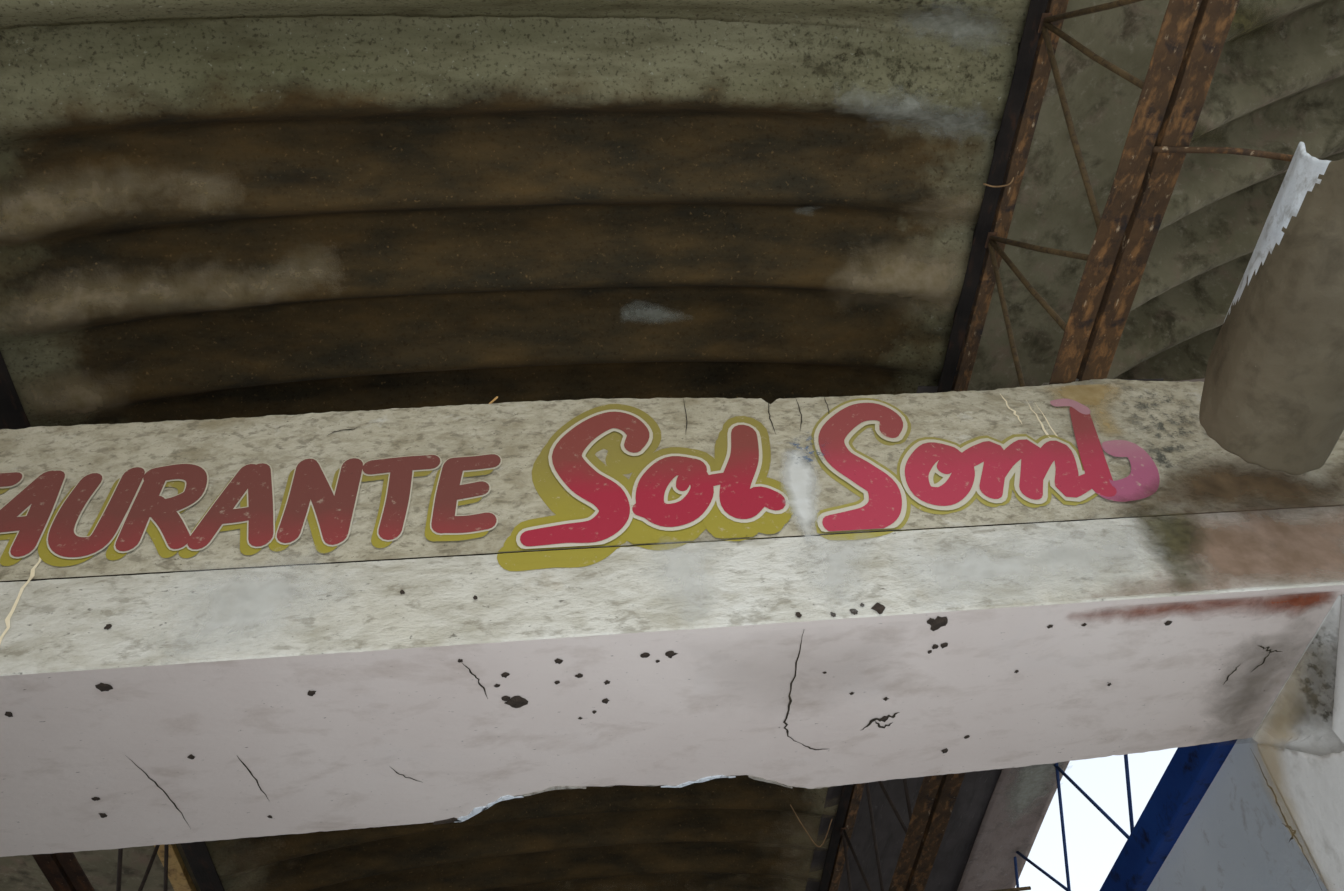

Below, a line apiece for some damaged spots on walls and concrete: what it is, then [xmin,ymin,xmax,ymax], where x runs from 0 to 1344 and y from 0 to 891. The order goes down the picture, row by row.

water stain [0,179,133,237]
water stain [20,283,194,325]
water stain [848,254,958,308]
water stain [30,380,105,415]
crack [783,631,822,750]